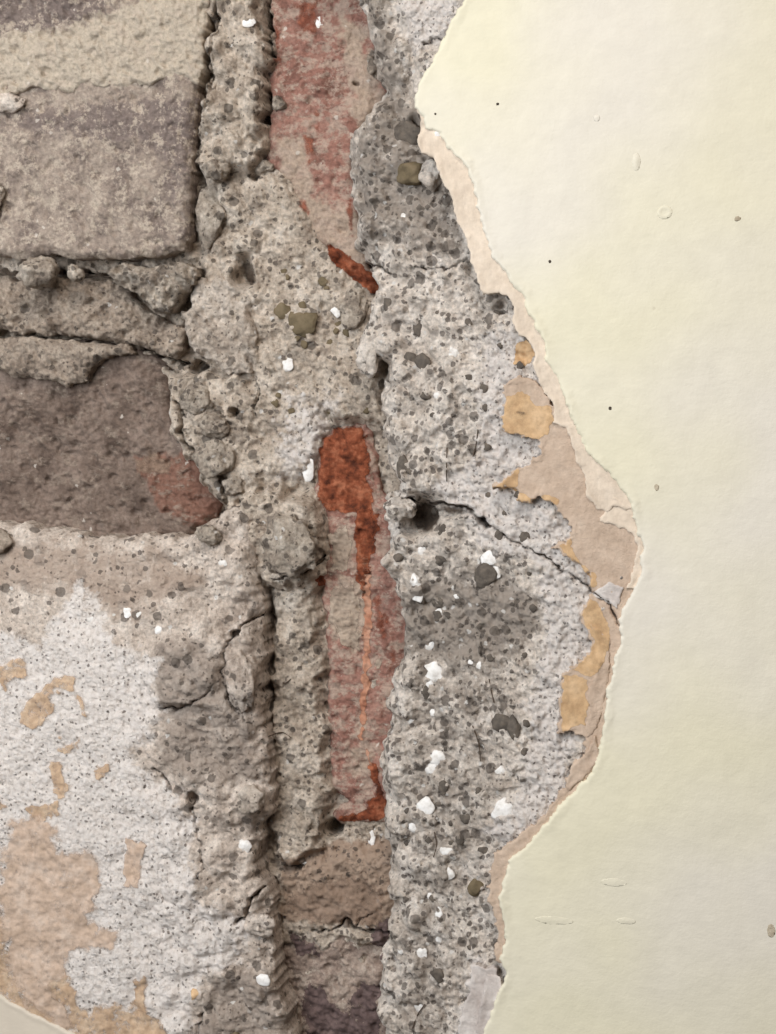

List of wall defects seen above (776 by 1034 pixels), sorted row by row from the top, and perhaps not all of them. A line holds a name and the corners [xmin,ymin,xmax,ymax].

rust [296,0,317,36]
rust [304,112,319,163]
rust [327,244,379,294]
peeling [0,336,138,388]
crack [144,348,191,365]
spalling [349,0,592,1034]
crack [408,497,617,621]
peeling [328,584,363,651]
rust [317,426,389,822]
spalling [0,506,303,1034]